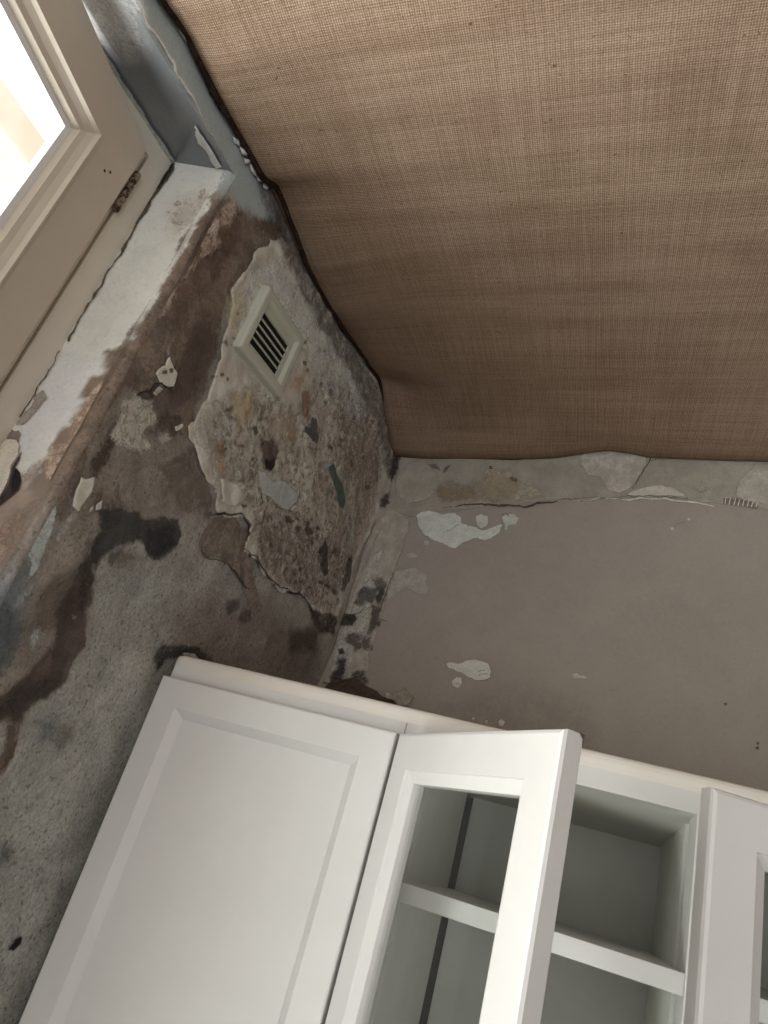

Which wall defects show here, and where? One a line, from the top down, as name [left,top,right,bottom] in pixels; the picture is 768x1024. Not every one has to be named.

peeling [133,0,222,168]
peeling [233,137,268,190]
peeling [159,196,241,317]
peeling [0,350,60,505]
damp [22,380,106,480]
peeling [72,477,102,512]
damp [109,188,399,702]
peeling [110,221,768,688]
crack [444,458,715,508]
damp [0,421,213,774]